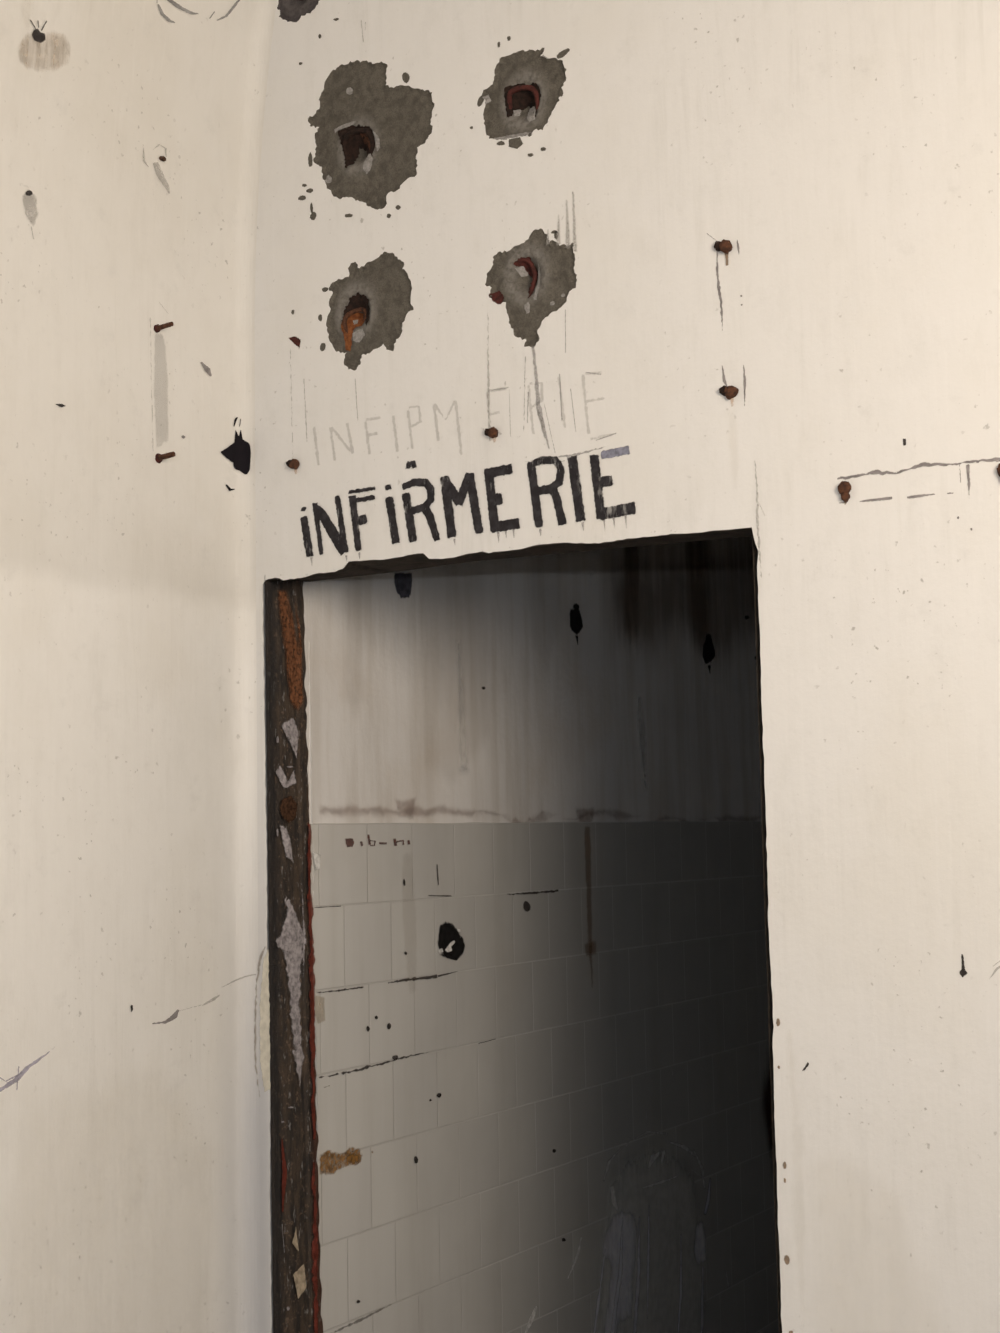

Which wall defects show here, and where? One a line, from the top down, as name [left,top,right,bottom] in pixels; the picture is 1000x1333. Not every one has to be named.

spalling [277,0,319,22]
spalling [298,60,435,220]
spalling [470,36,570,157]
spalling [318,252,414,371]
spalling [485,228,577,348]
rust [279,591,303,709]
rust [307,823,330,1140]
rust [311,1148,373,1333]